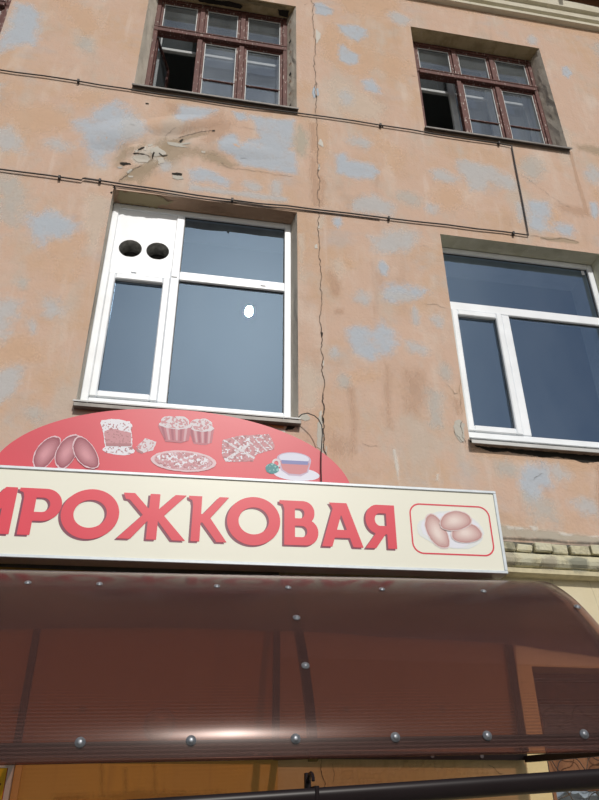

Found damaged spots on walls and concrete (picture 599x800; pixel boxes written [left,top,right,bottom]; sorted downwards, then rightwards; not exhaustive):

peeling [77,102,142,160]
flaking render [118,139,190,180]
peeling [176,107,216,121]
peeling [190,169,286,200]
peeling [218,113,295,172]
crack [304,1,327,456]
spalling [475,445,599,500]